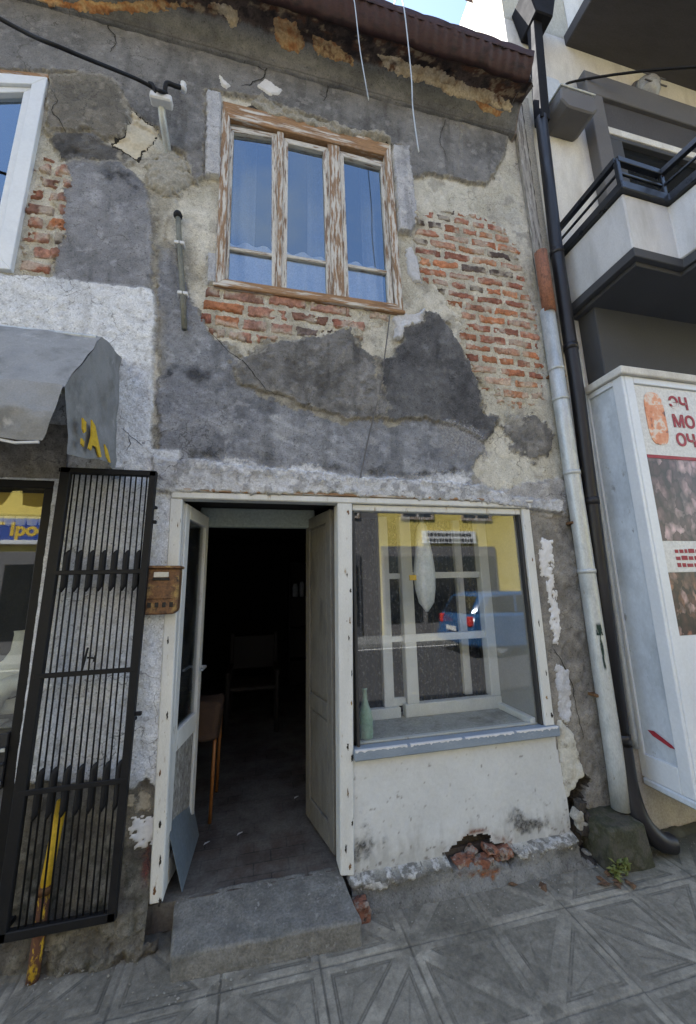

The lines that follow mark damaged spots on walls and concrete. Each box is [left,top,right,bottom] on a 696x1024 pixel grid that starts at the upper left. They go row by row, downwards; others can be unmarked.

peeling [273,16,354,67]
peeling [377,54,513,117]
flaking render [20,157,72,278]
flaking render [198,287,426,345]
flaking render [405,210,545,409]
crack [554,650,584,737]
peeling [127,788,162,850]
water stain [511,810,543,834]